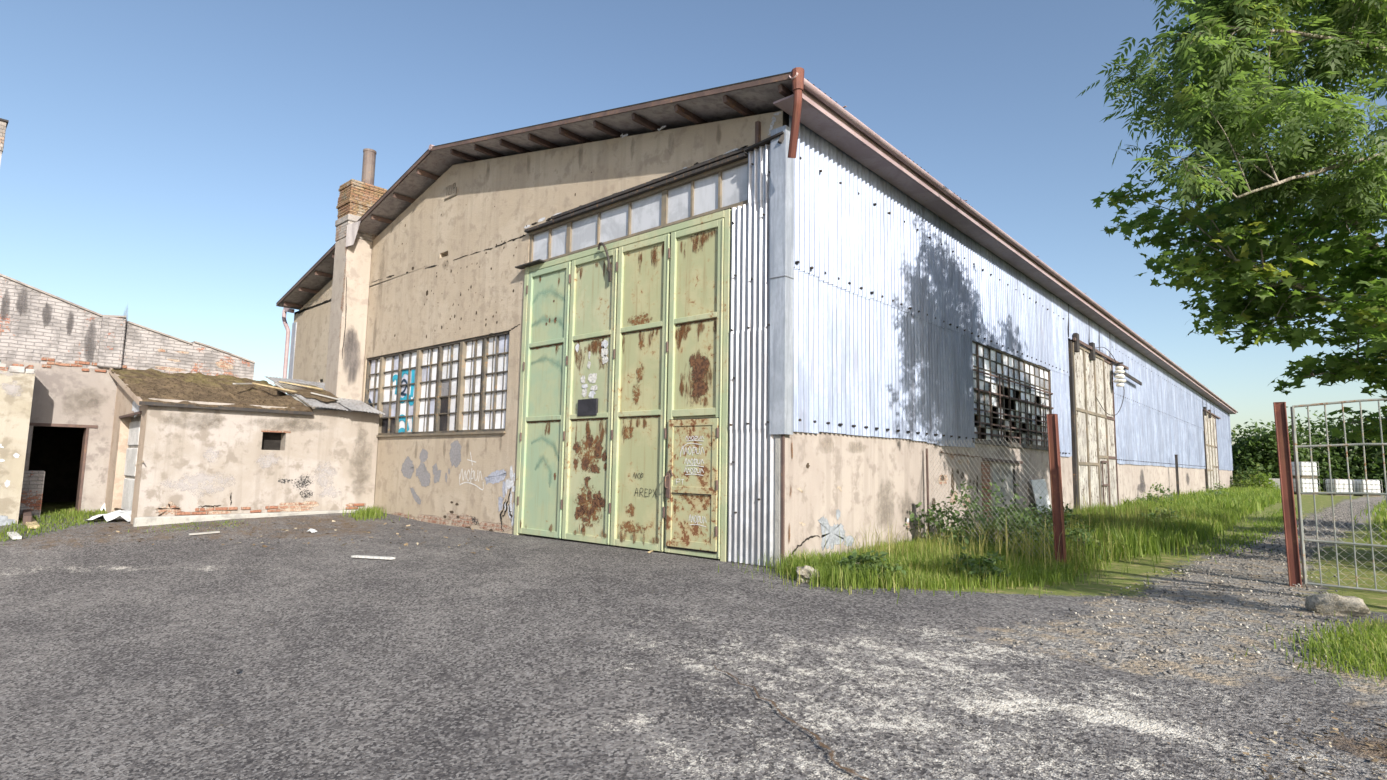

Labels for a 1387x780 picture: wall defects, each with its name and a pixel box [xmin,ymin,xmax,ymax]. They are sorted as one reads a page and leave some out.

rust [638,229,715,267]
damp [345,330,358,380]
rust [527,313,717,544]